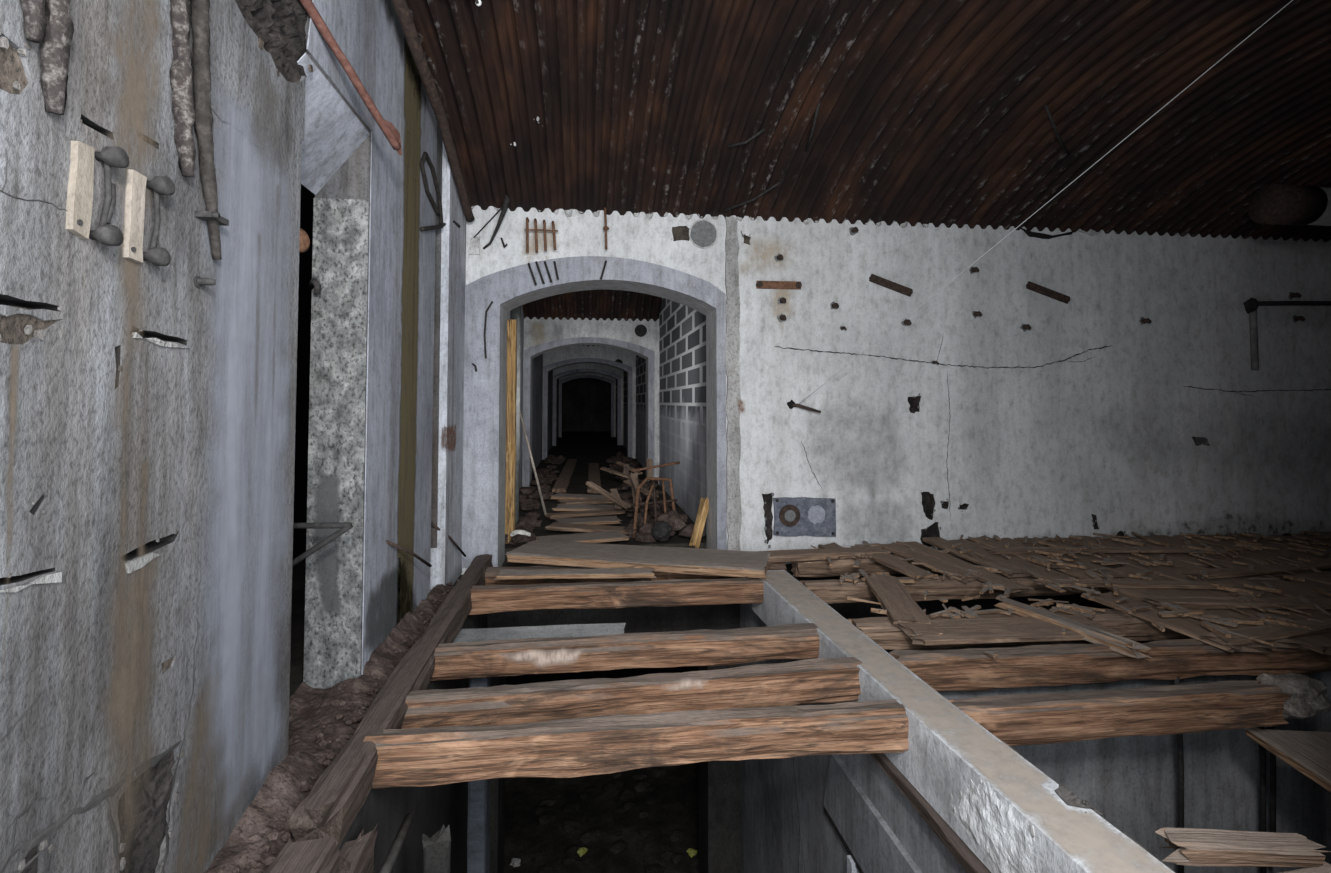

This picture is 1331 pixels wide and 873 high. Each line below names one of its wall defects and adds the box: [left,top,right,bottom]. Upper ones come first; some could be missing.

spalling [0,29,31,94]
spalling [235,0,313,83]
spalling [0,305,65,344]
spalling [920,492,969,547]
spalling [118,748,184,873]
spalling [17,839,54,873]